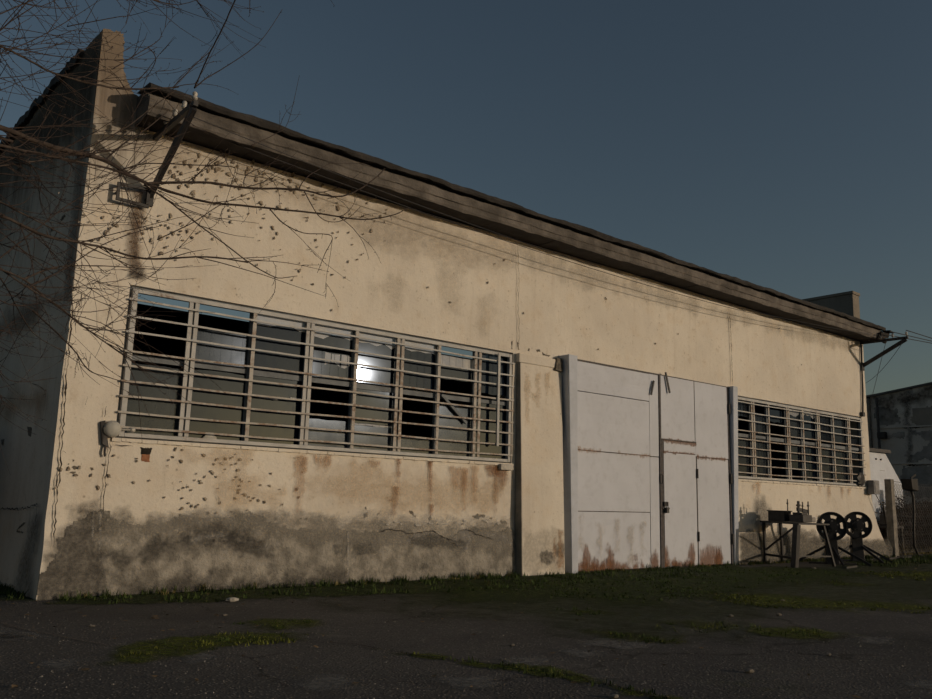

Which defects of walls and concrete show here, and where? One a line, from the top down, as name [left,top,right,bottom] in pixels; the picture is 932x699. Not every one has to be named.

peeling [900,429,932,498]
water stain [42,509,516,600]
rust [578,544,723,571]